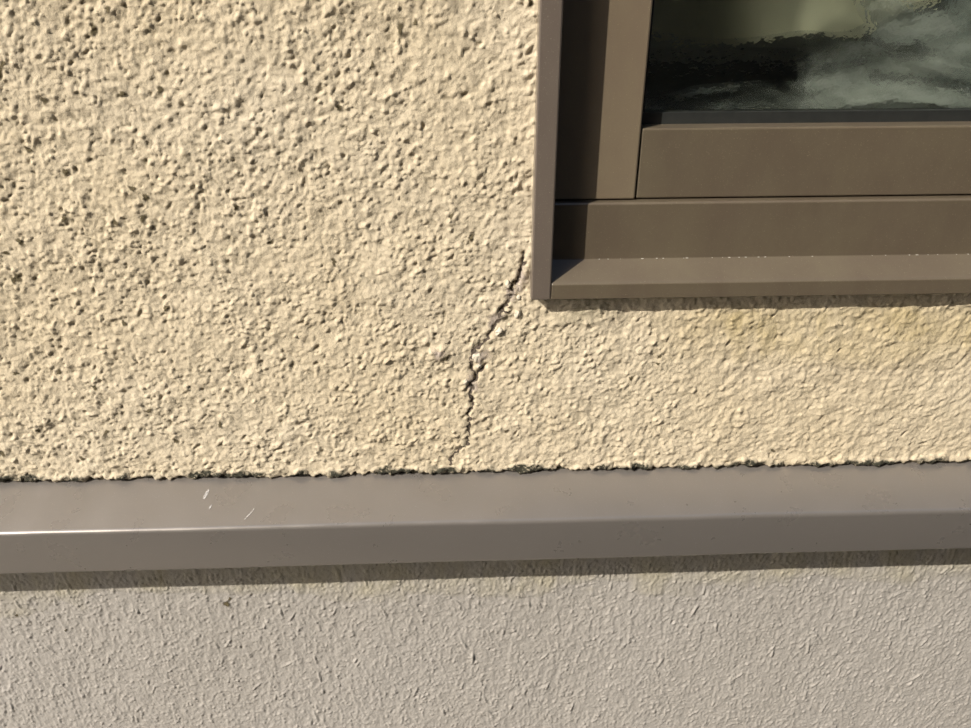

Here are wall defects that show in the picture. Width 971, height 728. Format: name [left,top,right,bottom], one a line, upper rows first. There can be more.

crack [448,252,527,465]